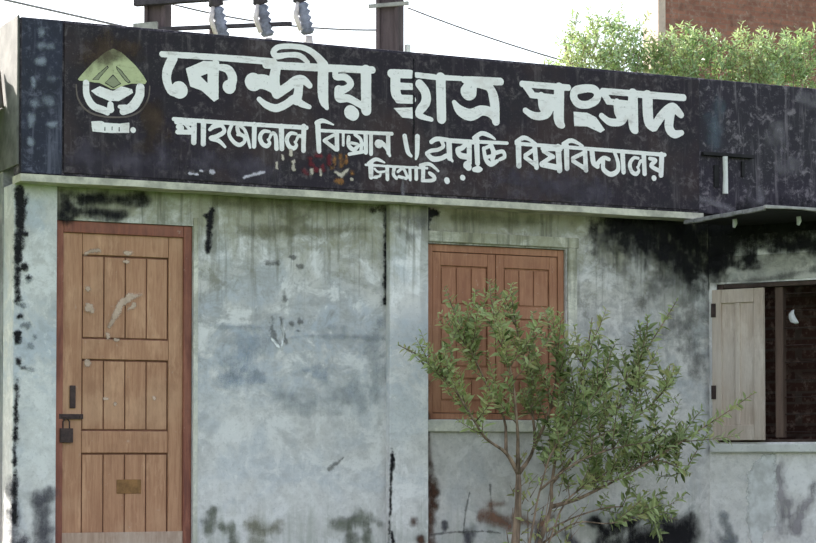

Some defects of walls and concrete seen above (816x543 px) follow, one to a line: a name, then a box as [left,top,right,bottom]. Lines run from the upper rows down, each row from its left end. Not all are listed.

damp [57,192,150,223]
damp [203,207,215,254]
damp [242,200,348,236]
damp [13,185,36,349]
damp [590,216,816,294]
damp [5,379,54,543]
damp [776,465,816,535]
damp [204,507,235,543]
damp [248,521,278,535]
damp [332,512,371,543]
damp [588,512,699,543]
damp [720,513,737,543]